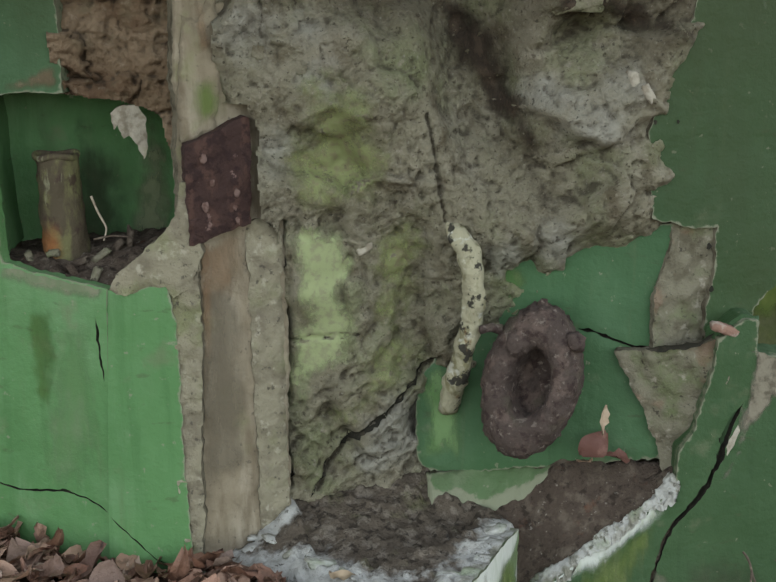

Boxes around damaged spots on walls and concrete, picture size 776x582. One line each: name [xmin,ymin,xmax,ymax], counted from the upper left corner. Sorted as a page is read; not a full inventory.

spalling [46,0,173,147]
spalling [210,0,739,502]
crack [96,323,104,379]
crack [0,482,165,563]
crack [651,406,748,582]